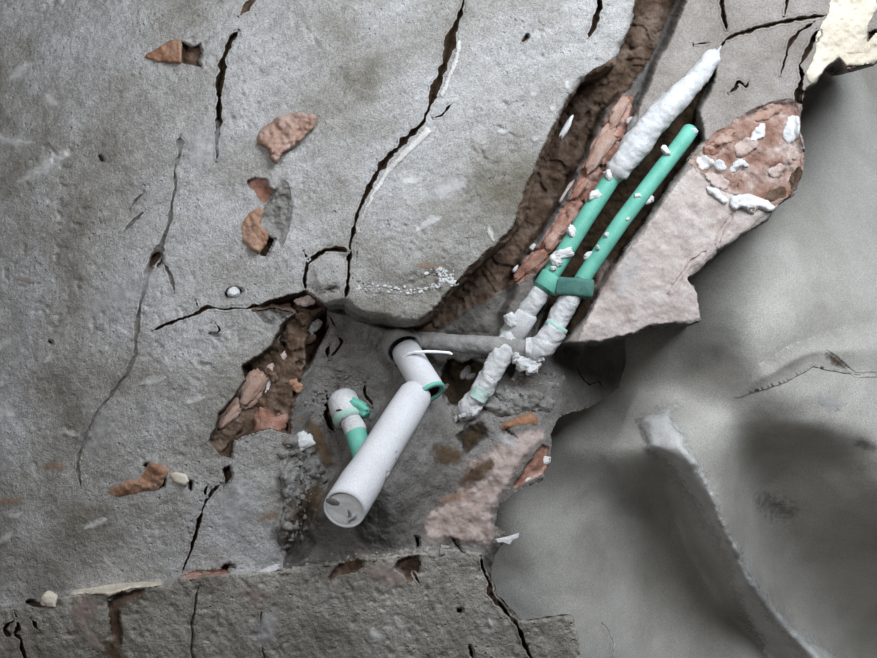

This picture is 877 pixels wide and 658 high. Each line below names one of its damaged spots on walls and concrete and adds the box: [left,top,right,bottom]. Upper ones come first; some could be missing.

crack [73,0,467,489]
spalling [257,112,317,164]
spalling [408,0,677,333]
crack [586,0,605,39]
flaking render [578,98,804,343]
crack [694,0,827,114]
flaking render [807,0,877,84]
crack [1,609,41,658]
crack [180,483,222,658]
spalling [208,291,331,554]
flaking render [394,384,557,585]
crack [478,556,535,658]